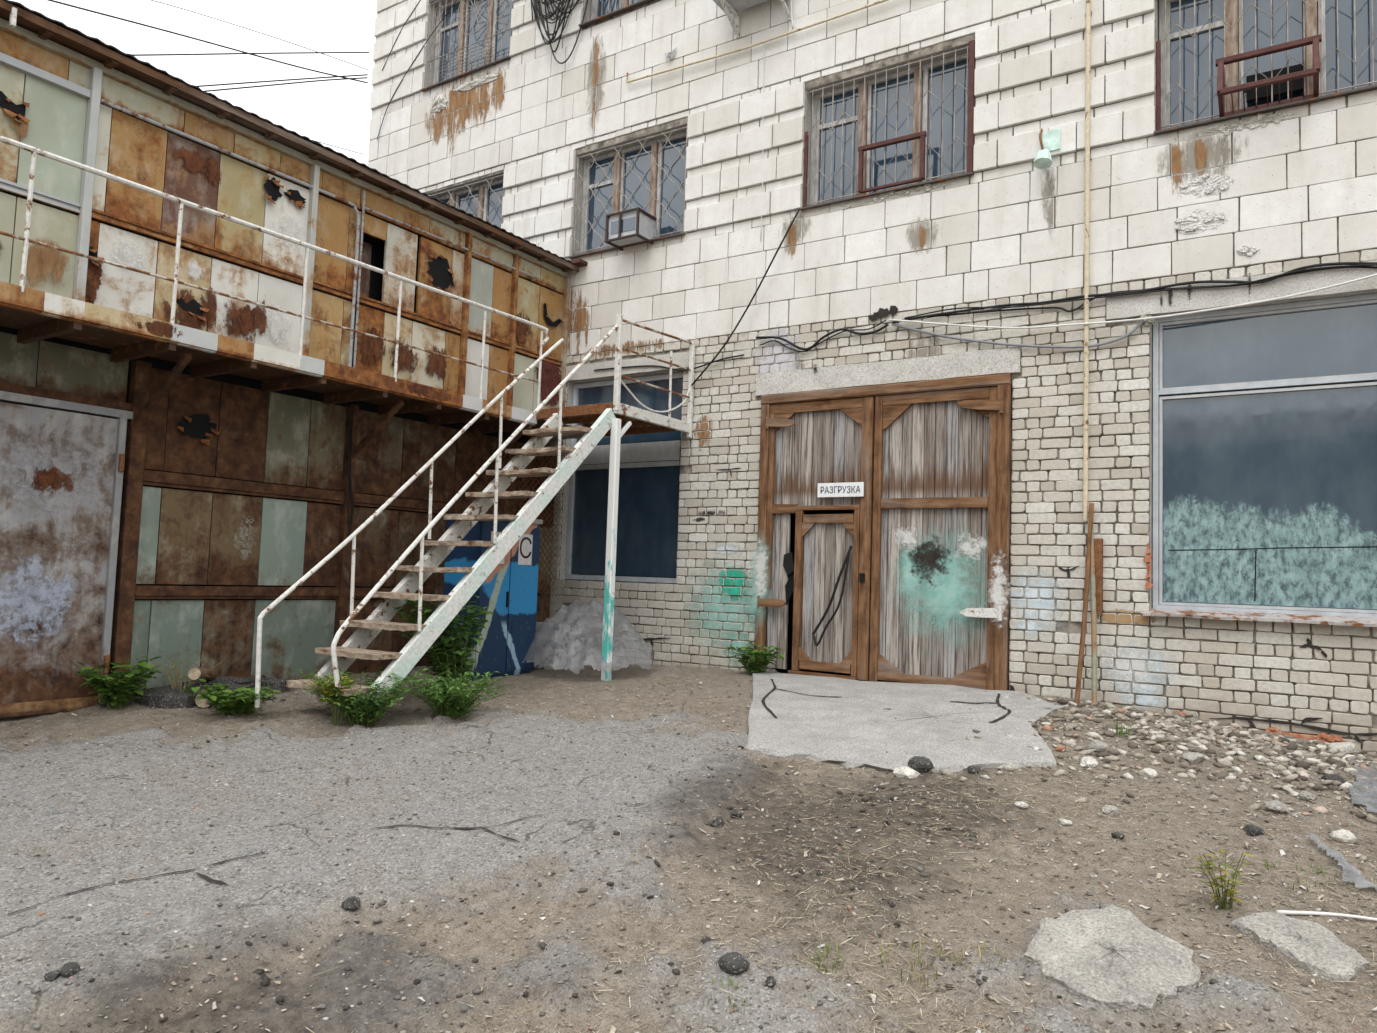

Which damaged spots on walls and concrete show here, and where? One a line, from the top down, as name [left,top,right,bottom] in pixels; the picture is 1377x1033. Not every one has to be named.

peeling [4,98,30,123]
rust [425,68,505,150]
rust [587,37,606,141]
peeling [264,176,305,210]
peeling [188,260,201,280]
rust [137,287,268,341]
rust [357,328,451,401]
rust [24,466,74,494]